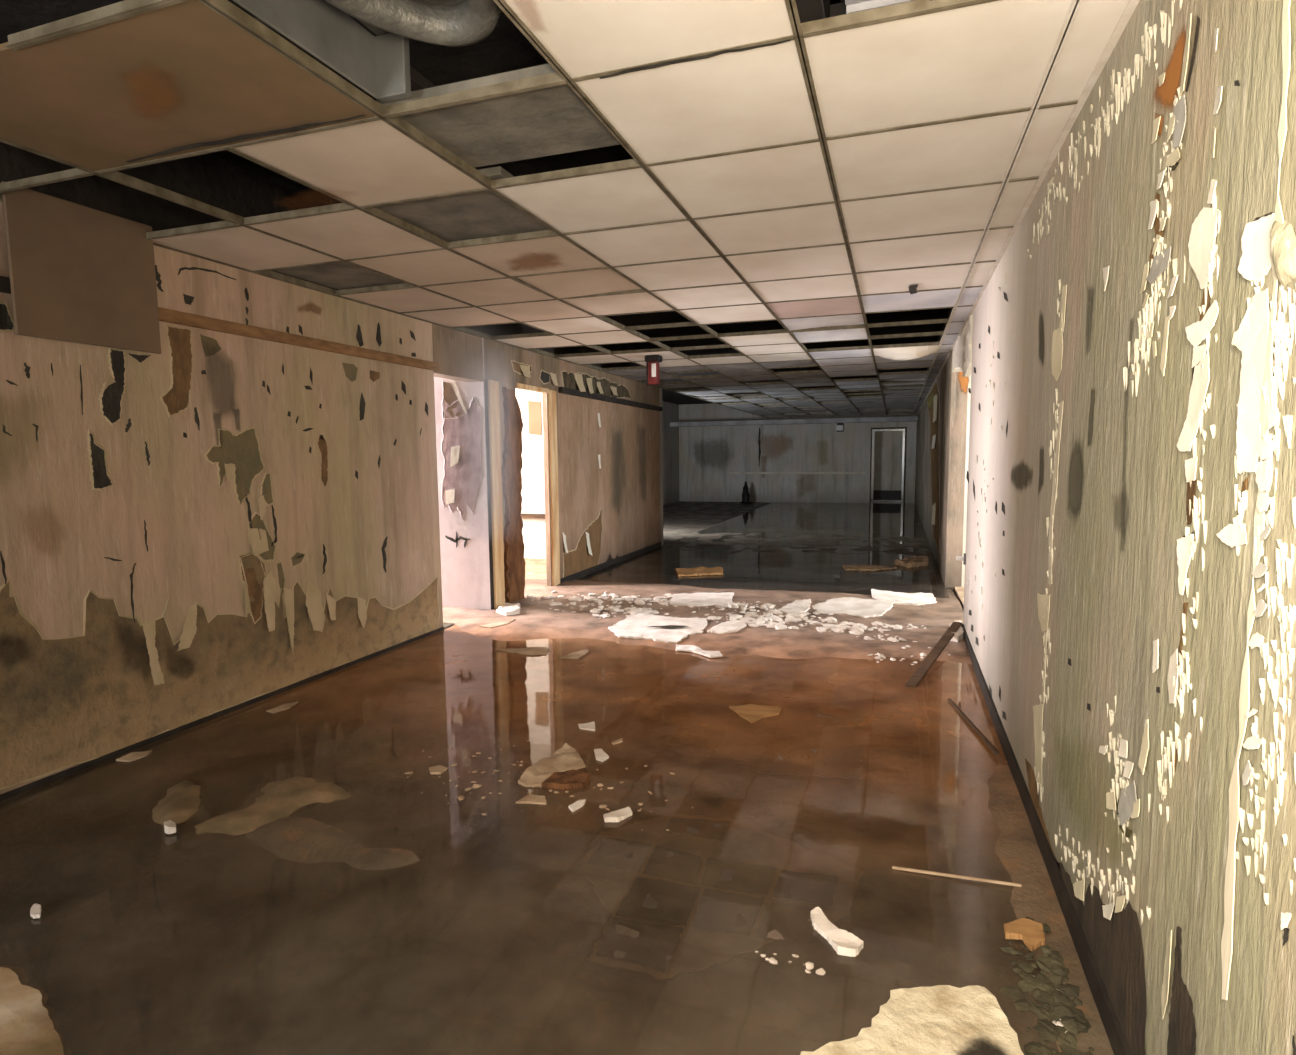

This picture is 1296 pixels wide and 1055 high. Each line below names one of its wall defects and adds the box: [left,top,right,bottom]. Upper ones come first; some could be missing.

peeling [98,347,151,426]
peeling [160,325,221,418]
peeling [342,362,380,421]
peeling [356,323,382,347]
peeling [511,360,631,399]
peeling [287,411,328,487]
peeling [395,380,483,520]
flaking render [501,387,526,603]
peeling [562,509,602,578]
peeling [966,457,1005,646]
peeling [1025,0,1296,1055]
peeling [0,427,440,790]